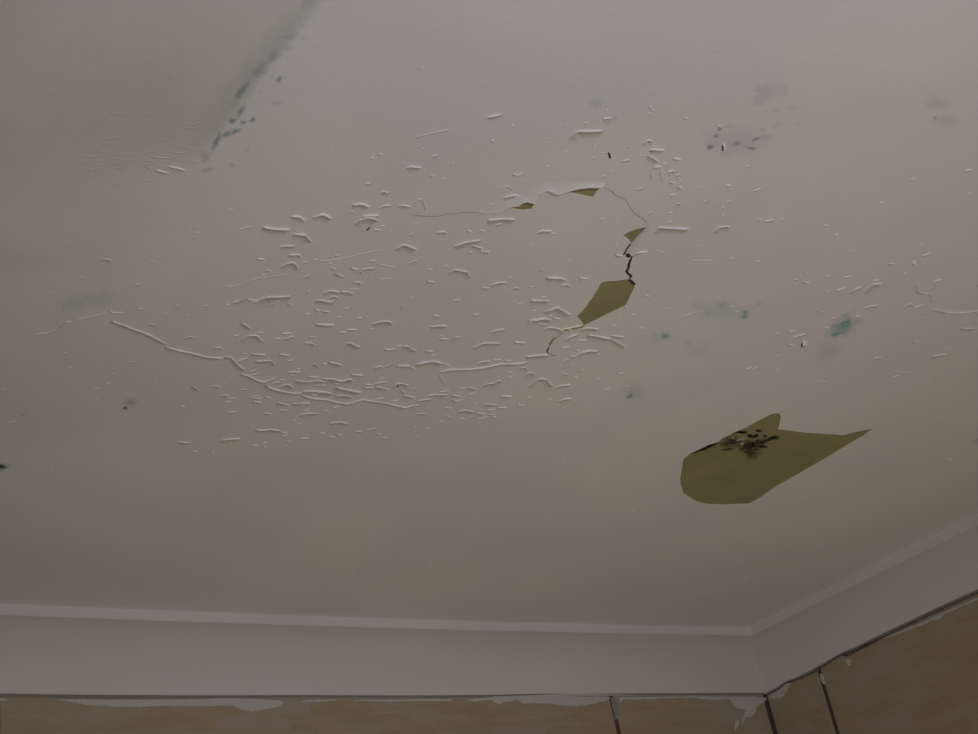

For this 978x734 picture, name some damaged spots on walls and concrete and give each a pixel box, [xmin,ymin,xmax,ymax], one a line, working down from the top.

peeling [467,181,606,215]
peeling [623,226,655,254]
crack [623,243,648,285]
peeling [546,279,635,356]
peeling [680,413,871,505]